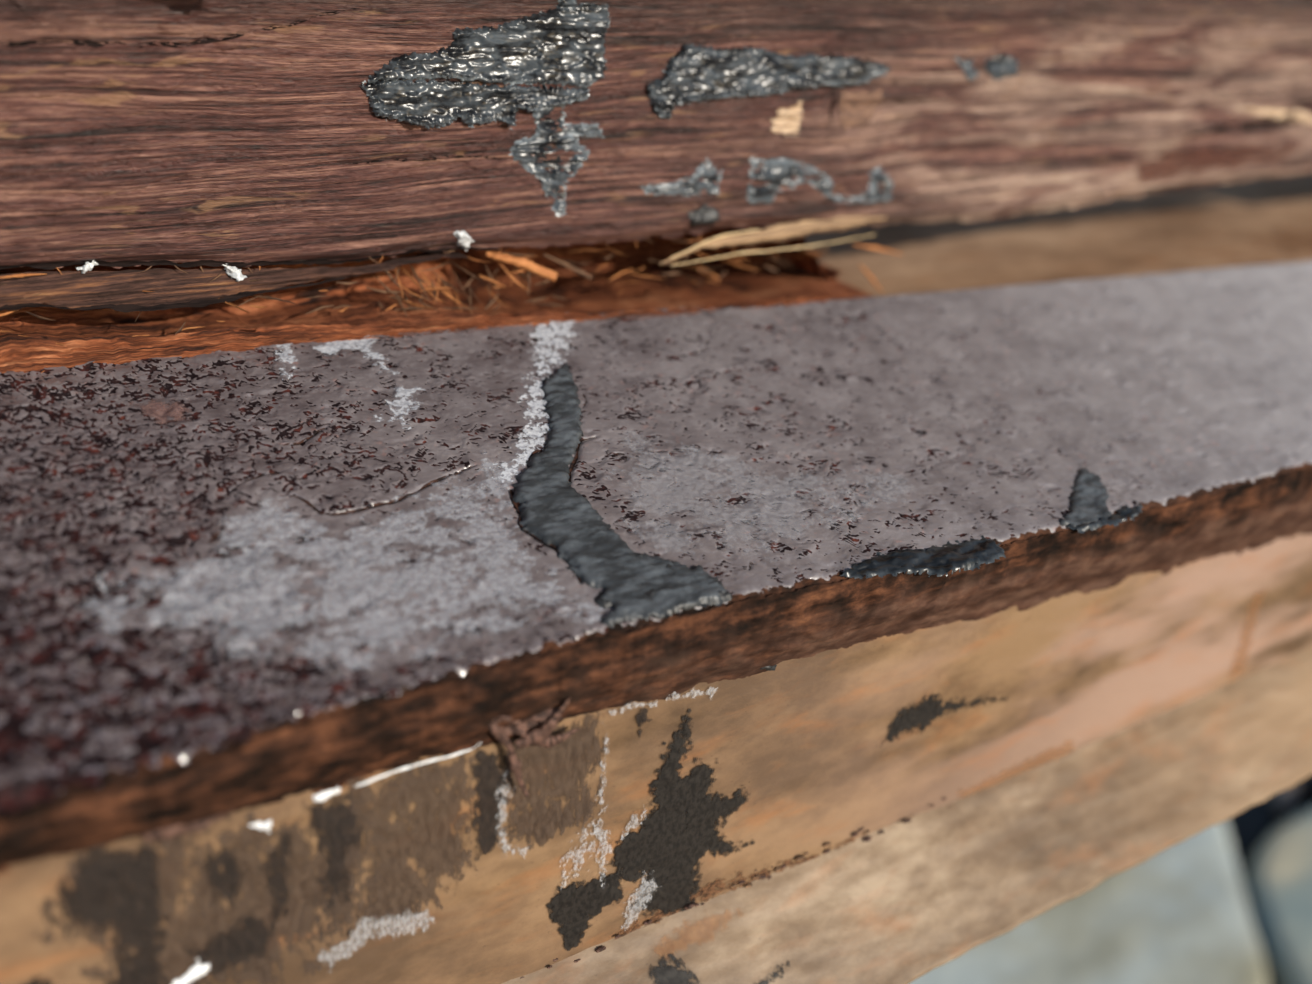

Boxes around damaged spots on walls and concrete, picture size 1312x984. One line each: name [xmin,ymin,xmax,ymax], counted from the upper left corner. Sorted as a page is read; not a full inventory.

peeling [360,0,610,216]
peeling [646,44,891,136]
peeling [641,158,723,227]
peeling [746,156,893,205]
efflorescence [276,343,295,379]
efflorescence [313,338,423,429]
efflorescence [481,320,576,488]
peeling [509,363,733,628]
peeling [1059,464,1143,533]
peeling [839,535,1006,579]